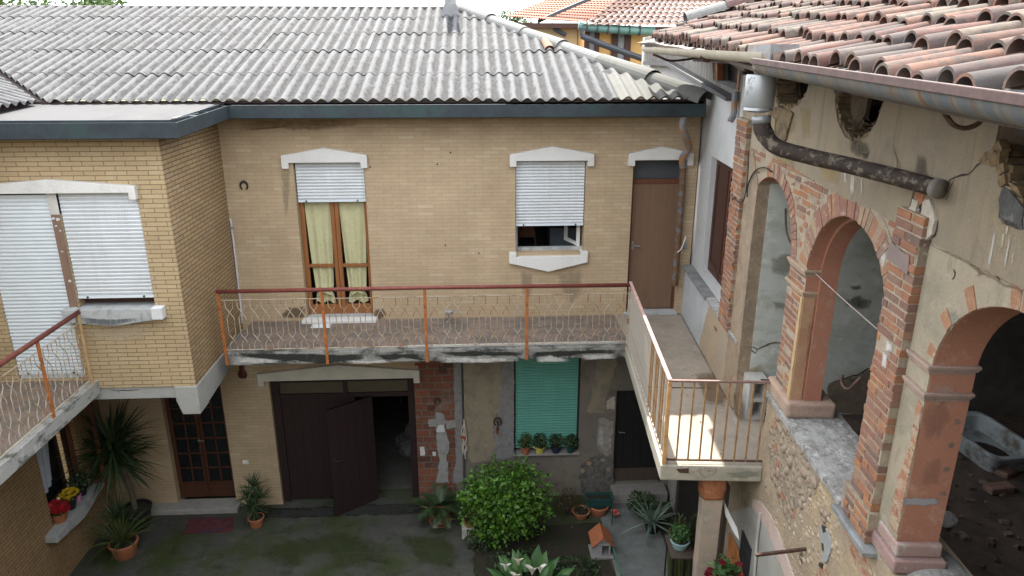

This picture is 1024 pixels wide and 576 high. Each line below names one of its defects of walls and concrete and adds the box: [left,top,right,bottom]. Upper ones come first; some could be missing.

spalling [768,82,806,141]
spalling [836,94,885,143]
spalling [978,139,1024,205]
water stain [240,353,421,364]
water stain [442,351,516,363]
water stain [536,350,614,362]